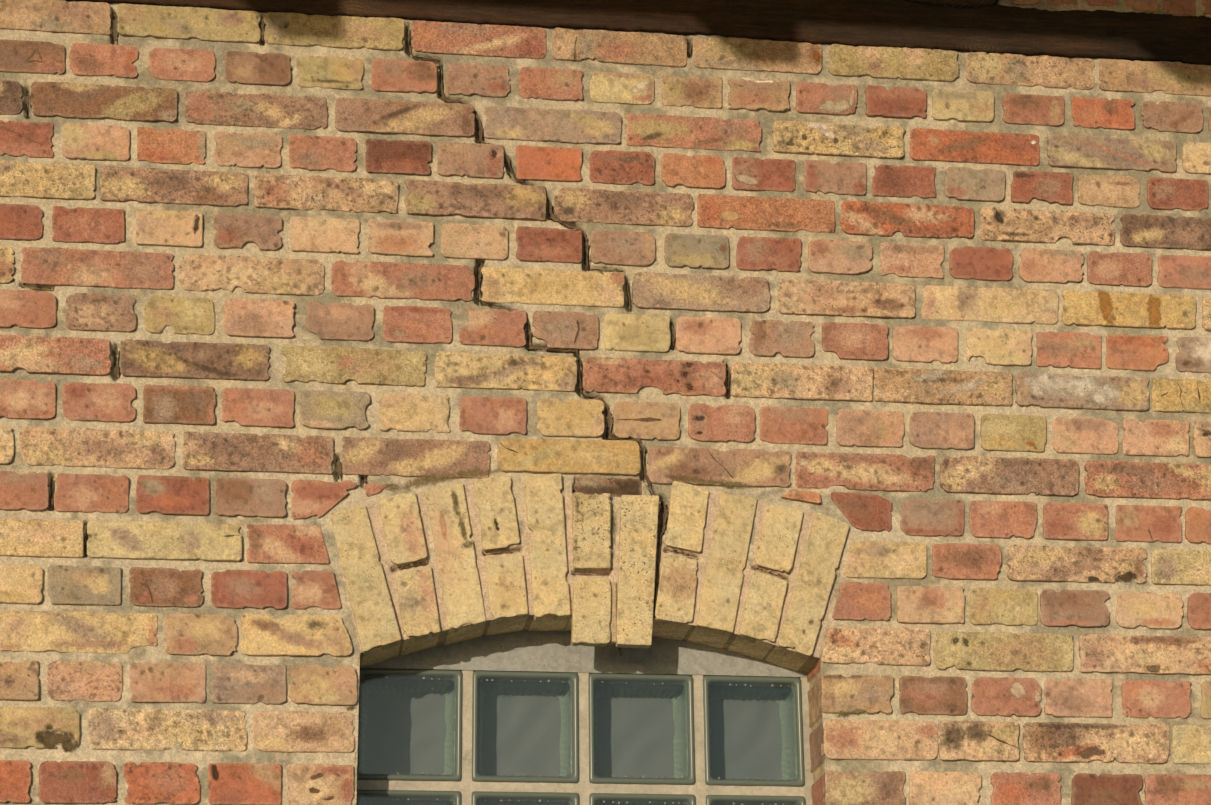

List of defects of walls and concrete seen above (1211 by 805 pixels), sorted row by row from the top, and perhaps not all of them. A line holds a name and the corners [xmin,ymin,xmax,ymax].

crack [406,26,631,309]
crack [476,263,668,614]
crack [668,321,676,349]
crack [724,363,732,397]